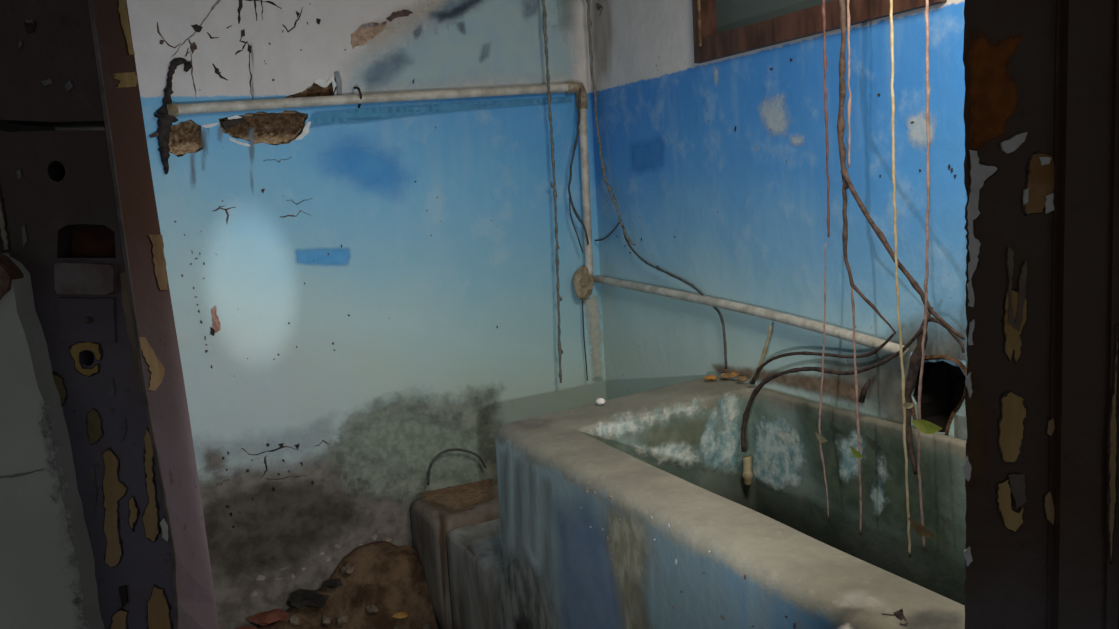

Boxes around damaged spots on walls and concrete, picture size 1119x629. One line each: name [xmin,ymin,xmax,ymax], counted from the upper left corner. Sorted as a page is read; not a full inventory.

crack [157,0,321,100]
flaking render [169,114,311,154]
flaking render [293,71,342,98]
peeling [351,9,413,49]
damp [357,0,571,86]
rust [968,35,1022,149]
peeling [948,149,999,345]
damp [199,389,620,629]
damp [591,395,803,490]
damp [840,432,865,479]
damp [871,462,886,515]
peeling [996,391,1027,533]